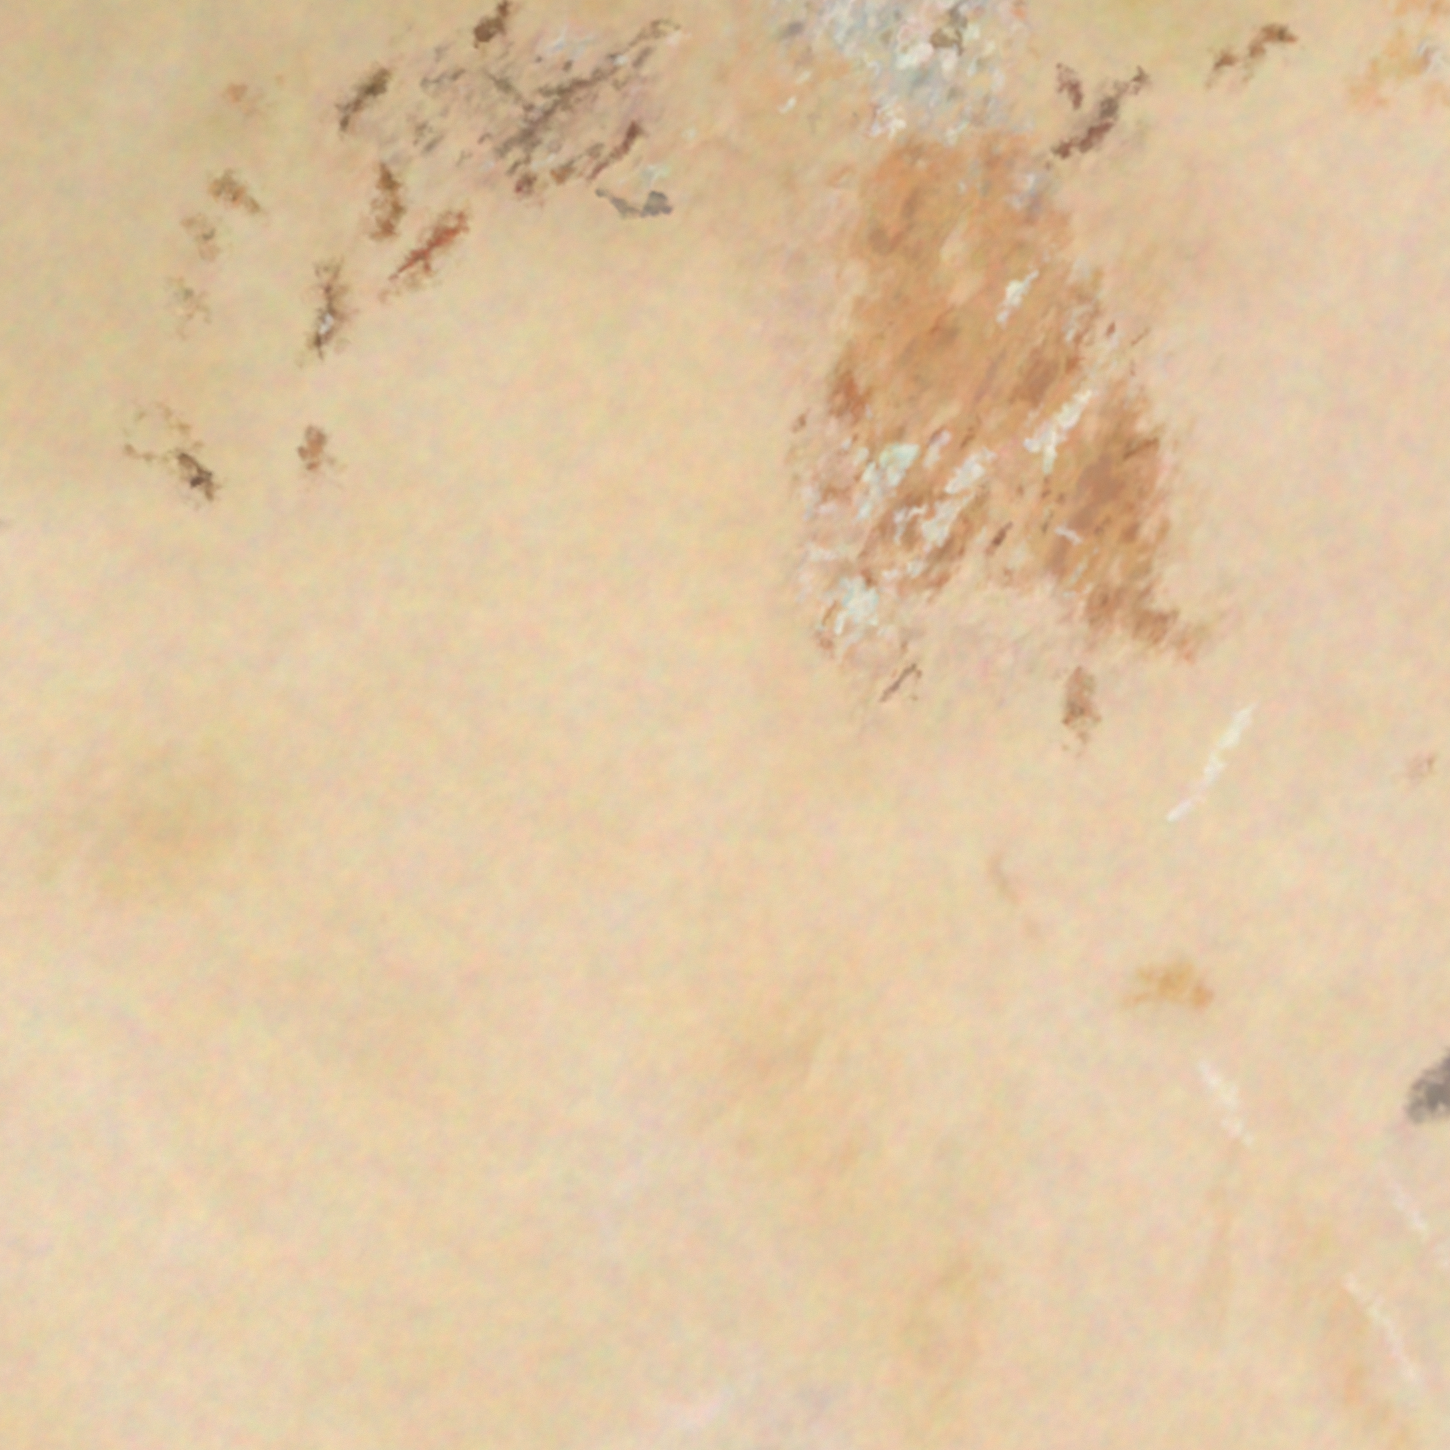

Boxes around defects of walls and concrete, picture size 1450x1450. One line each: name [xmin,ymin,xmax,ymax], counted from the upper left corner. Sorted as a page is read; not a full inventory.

spalling [447,0,538,69]
leakage [773,0,1374,156]
spalling [291,49,560,374]
spalling [593,148,703,227]
spalling [741,39,1287,780]
peeling [1373,1039,1450,1153]